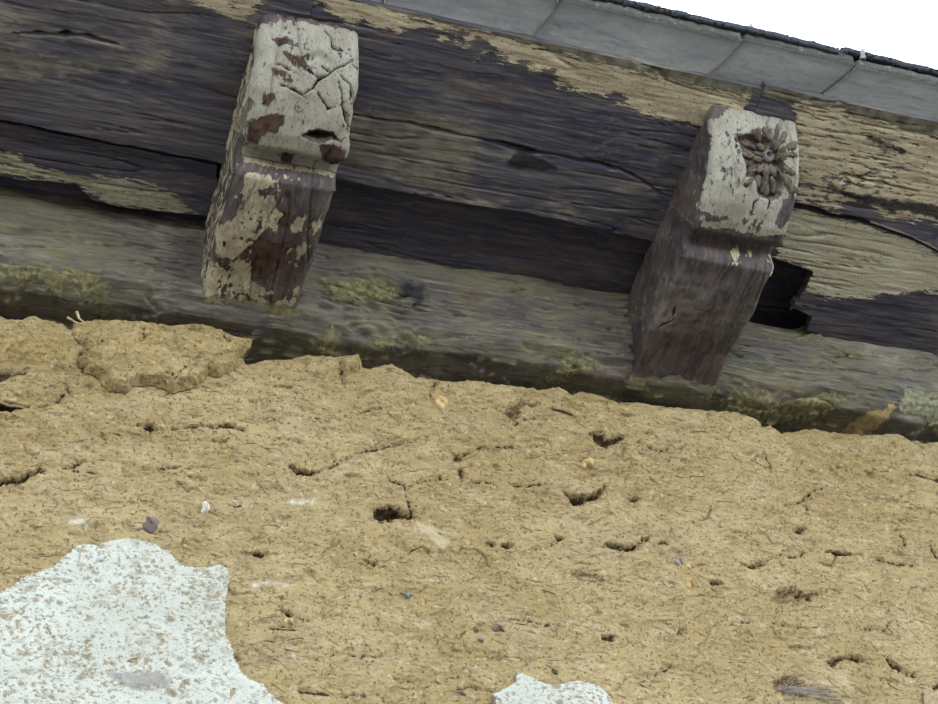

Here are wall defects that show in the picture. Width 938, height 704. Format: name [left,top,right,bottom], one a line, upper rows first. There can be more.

peeling [187,0,266,23]
crack [280,35,352,130]
peeling [201,0,938,307]
peeling [0,151,199,214]
spalling [505,402,525,422]
spalling [592,432,624,449]
spalling [0,471,42,487]
spalling [373,507,409,524]
spalling [572,570,602,583]
spalling [774,589,818,603]
spalling [774,678,800,695]